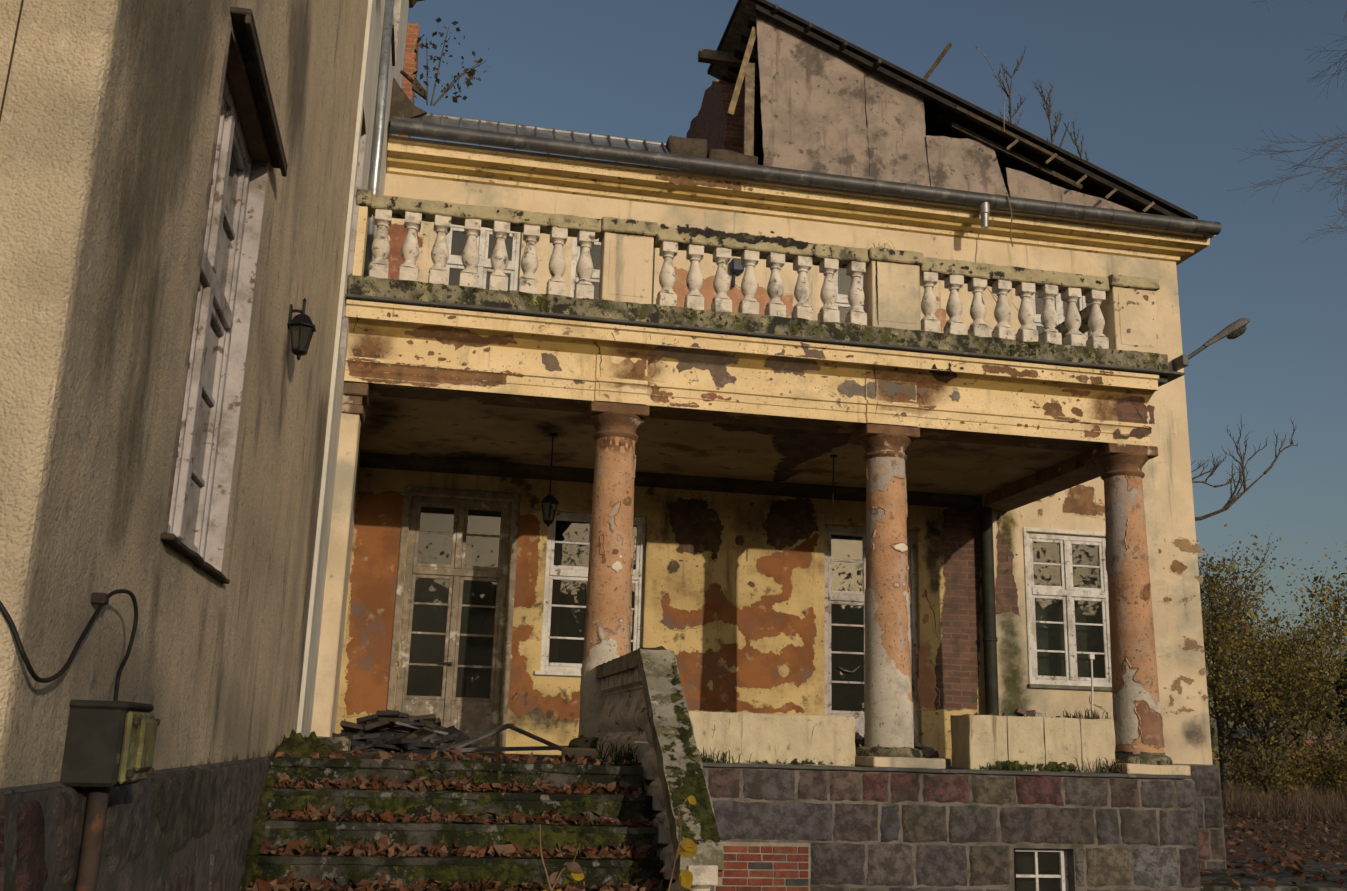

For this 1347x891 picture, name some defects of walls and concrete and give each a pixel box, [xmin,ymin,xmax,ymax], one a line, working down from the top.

leakage [290,6,308,141]
leakage [106,0,211,342]
leakage [128,285,154,463]
peeling [347,315,524,387]
peeling [541,350,585,384]
peeling [628,336,739,408]
spalling [760,342,1155,440]
leakage [299,403,327,694]
peeling [343,484,411,721]
peeling [508,512,633,738]
peeling [660,496,823,714]
peeling [1113,636,1209,749]